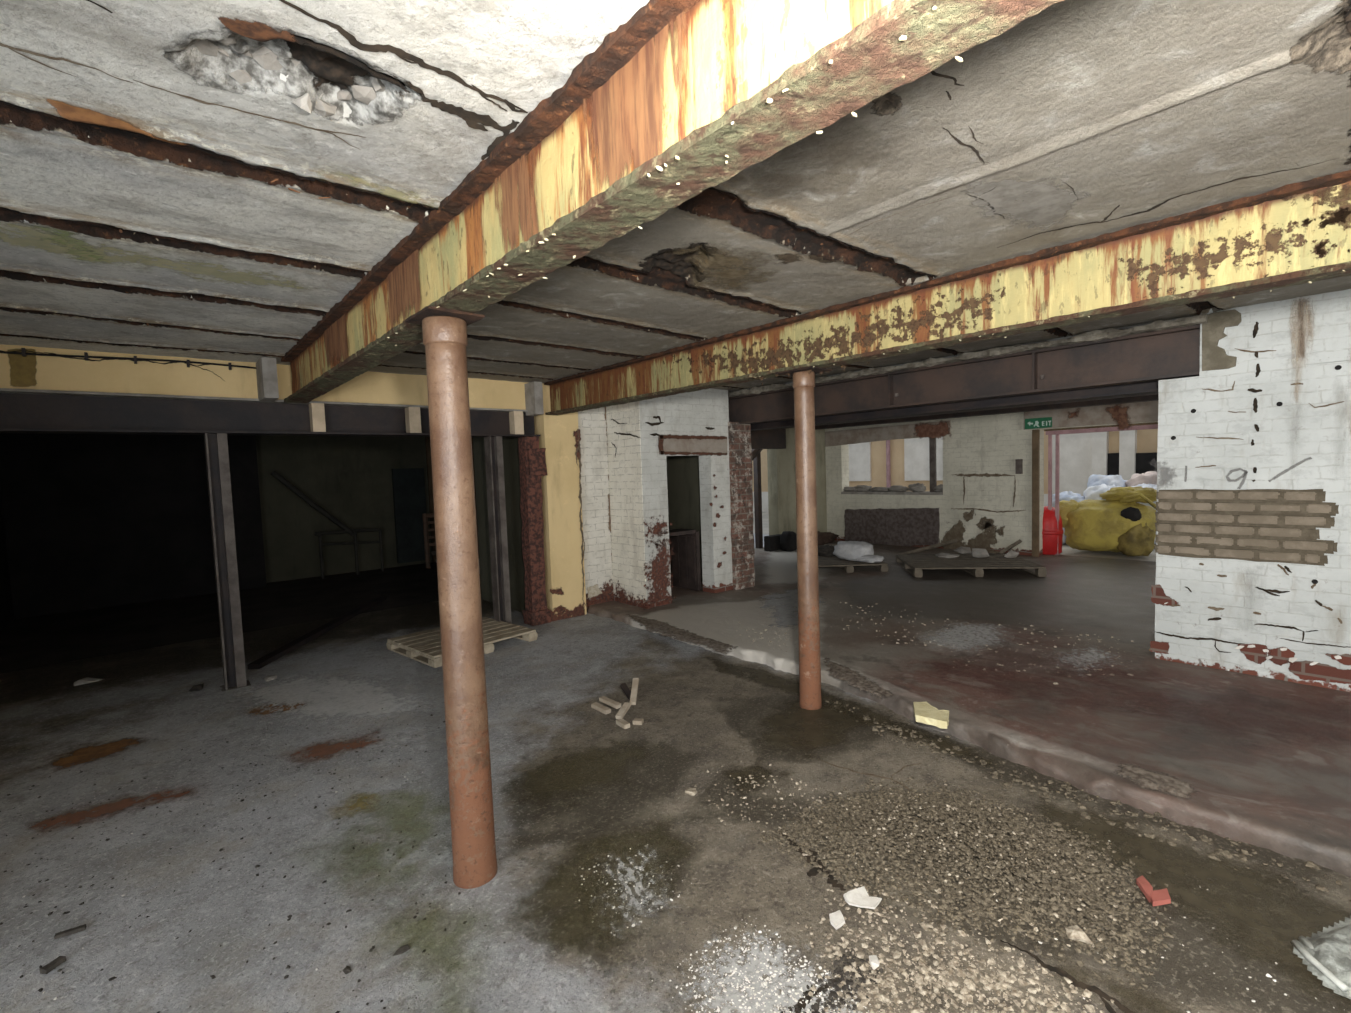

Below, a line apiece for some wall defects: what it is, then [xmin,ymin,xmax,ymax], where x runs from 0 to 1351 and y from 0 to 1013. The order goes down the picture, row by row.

crack [0,43,362,149]
spalling [164,17,422,126]
crack [280,0,528,160]
corrosion [583,11,686,189]
crack [831,70,1338,248]
leakage [639,243,843,291]
corrosion [496,187,1006,389]
corrosion [1117,183,1351,315]
peeling [538,515,738,654]
peeling [1234,644,1351,684]
leakage [521,827,687,947]
leakage [694,936,854,1013]